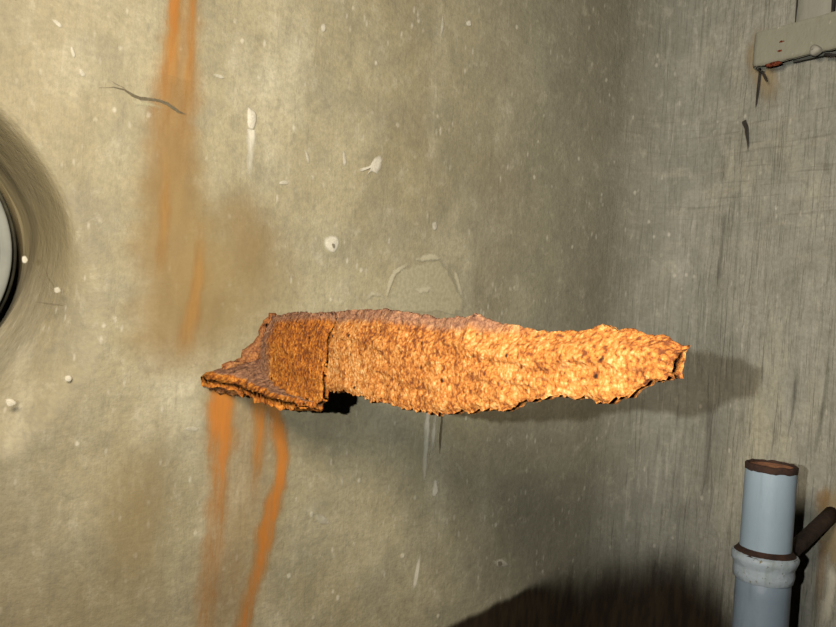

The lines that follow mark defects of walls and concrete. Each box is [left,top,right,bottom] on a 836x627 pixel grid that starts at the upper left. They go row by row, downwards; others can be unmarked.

corrosion [164,0,179,90]
crack [114,87,184,114]
corrosion [259,312,337,404]
corrosion [209,389,233,494]
corrosion [241,400,288,627]